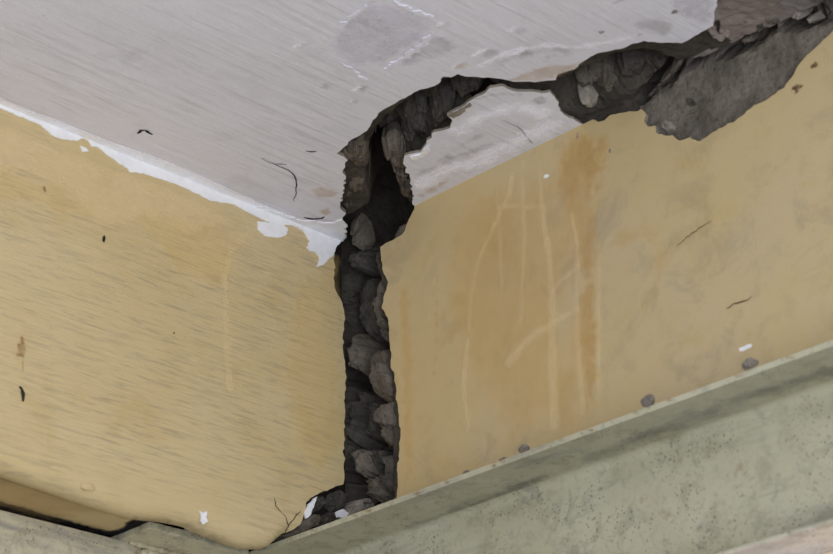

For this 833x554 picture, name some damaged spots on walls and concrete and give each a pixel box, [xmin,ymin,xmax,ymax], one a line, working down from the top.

spalling [640,0,833,141]
peeling [0,100,348,267]
crack [261,0,826,507]